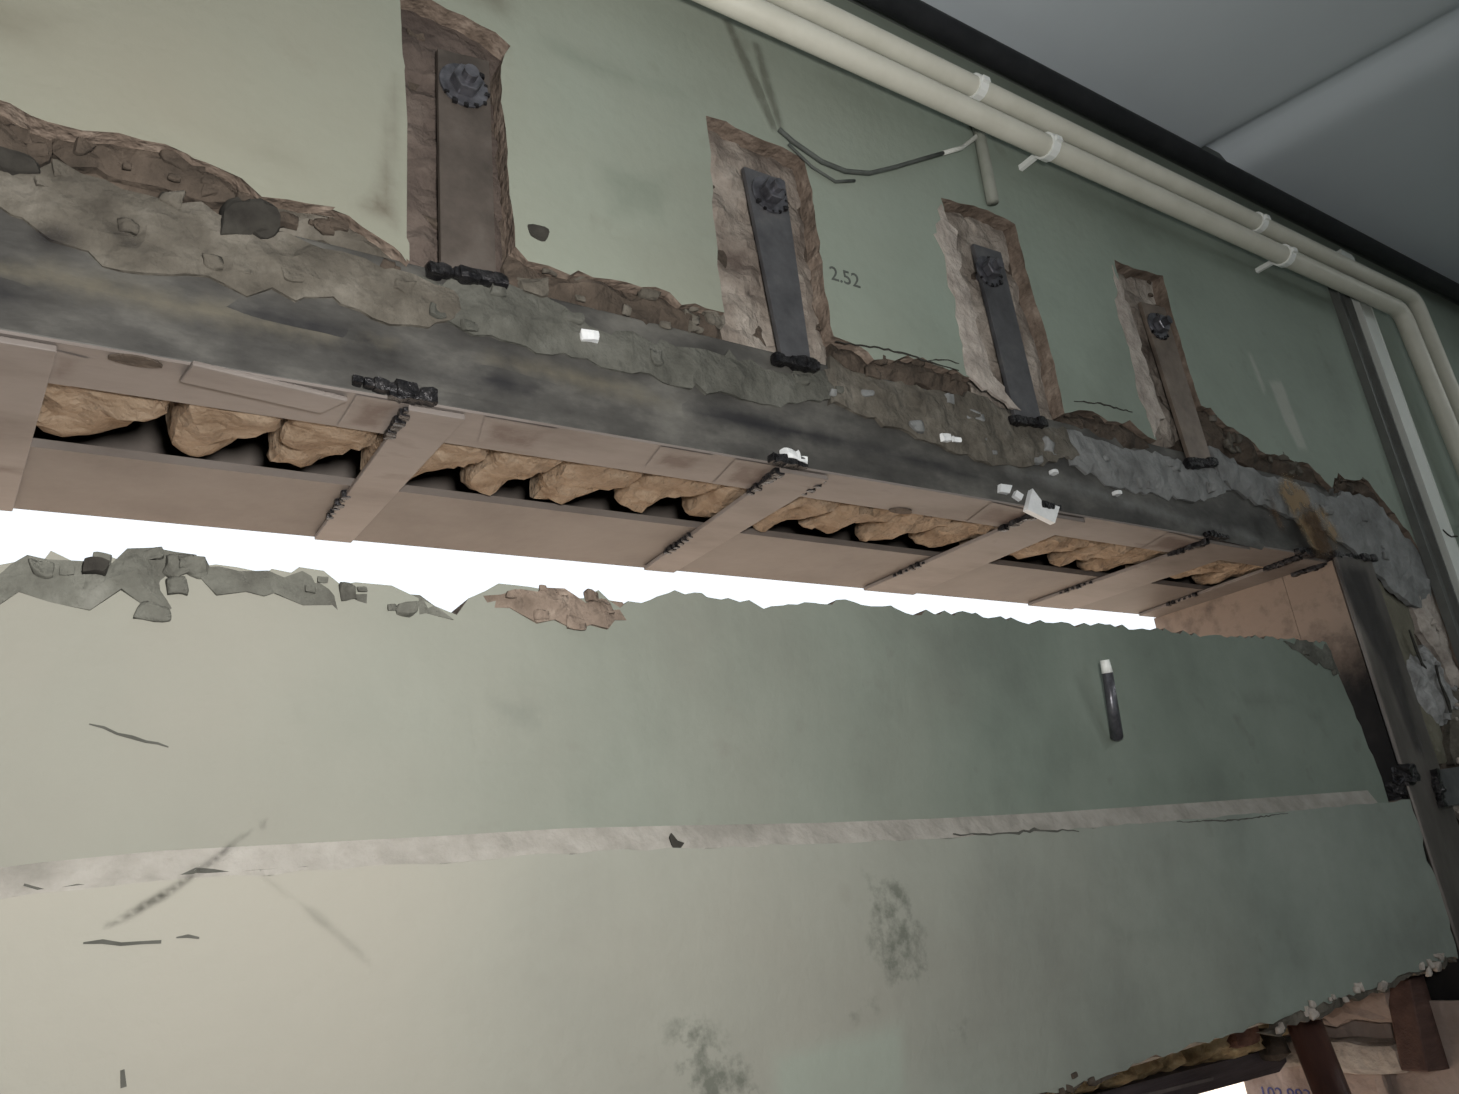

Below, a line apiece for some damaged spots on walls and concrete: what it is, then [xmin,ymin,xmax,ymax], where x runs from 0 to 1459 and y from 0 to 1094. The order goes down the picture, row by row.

spalling [0,115,401,272]
spalling [527,224,550,241]
spalling [490,254,725,340]
spalling [815,203,1021,455]
spalling [1034,265,1165,465]
spalling [36,383,384,471]
spalling [411,443,747,517]
spalling [752,497,998,548]
spalling [1197,411,1379,505]
spalling [1284,639,1340,676]
damp [824,862,941,1032]
damp [614,990,767,1094]